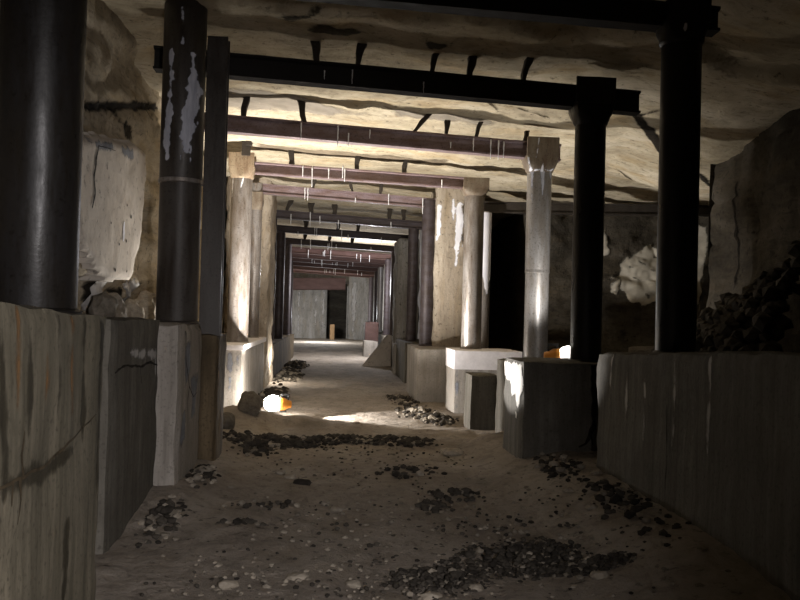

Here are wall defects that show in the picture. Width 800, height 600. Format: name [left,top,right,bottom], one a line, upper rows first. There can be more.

crack [92,145,116,208]
damp [452,199,464,266]
spalling [81,271,139,311]
crack [115,361,158,383]
crack [0,414,96,525]